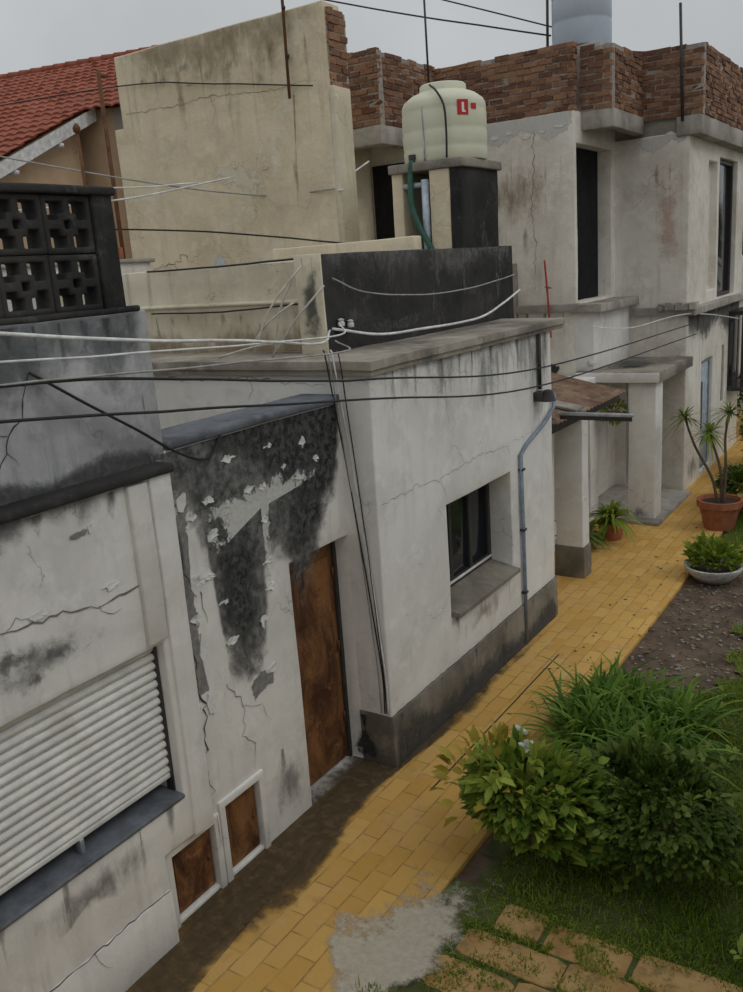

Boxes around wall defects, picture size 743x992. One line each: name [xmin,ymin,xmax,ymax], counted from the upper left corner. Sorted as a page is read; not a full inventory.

peeling [486,111,572,147]
crack [521,132,537,284]
crack [0,373,29,469]
water stain [0,404,338,676]
peeling [201,454,319,591]
water stain [1,646,66,682]
crack [0,580,139,636]
spalling [174,493,216,752]
crack [227,686,267,768]
spalling [252,661,277,698]